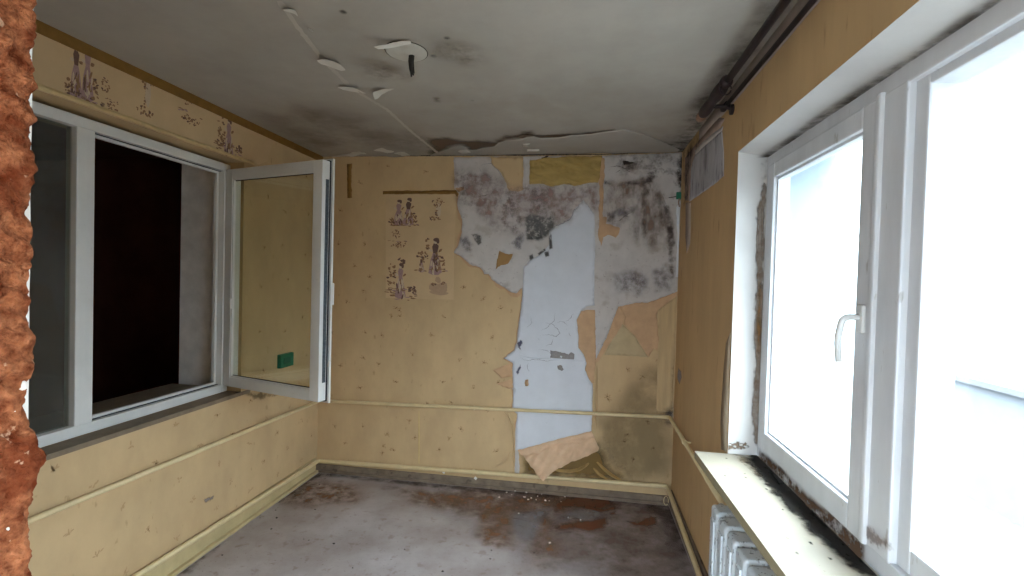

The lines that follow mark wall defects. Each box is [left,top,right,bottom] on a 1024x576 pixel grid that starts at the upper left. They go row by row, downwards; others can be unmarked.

peeling [375,40,411,49]
flaking render [333,129,682,433]
damp [461,173,595,259]
damp [605,158,674,284]
damp [740,183,877,576]